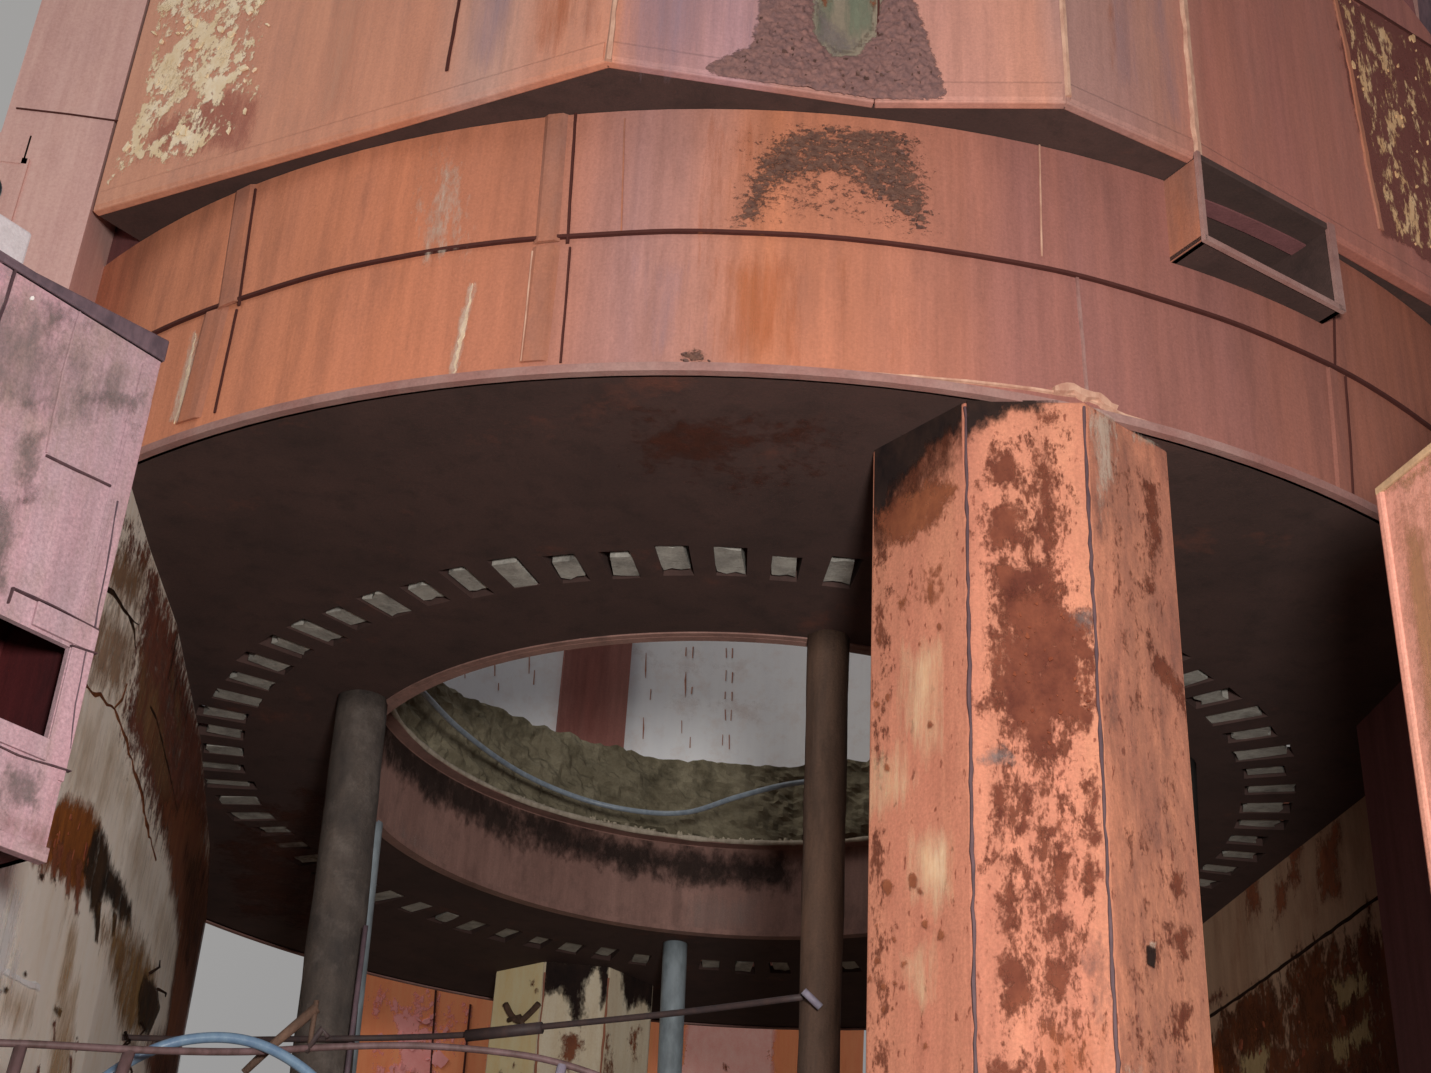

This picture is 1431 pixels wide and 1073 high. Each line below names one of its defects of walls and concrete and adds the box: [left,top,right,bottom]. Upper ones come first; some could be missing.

peeling [107,0,270,185]
peeling [1342,0,1431,249]
crack [107,587,139,647]
corrosion [873,478,956,567]
corrosion [1111,461,1163,615]
corrosion [33,795,101,915]
crack [86,684,178,861]
corrosion [90,511,211,1073]
corrosion [970,410,1107,1073]
peeling [372,986,471,1073]
corrosion [868,827,896,1073]
corrosion [1126,899,1400,1073]